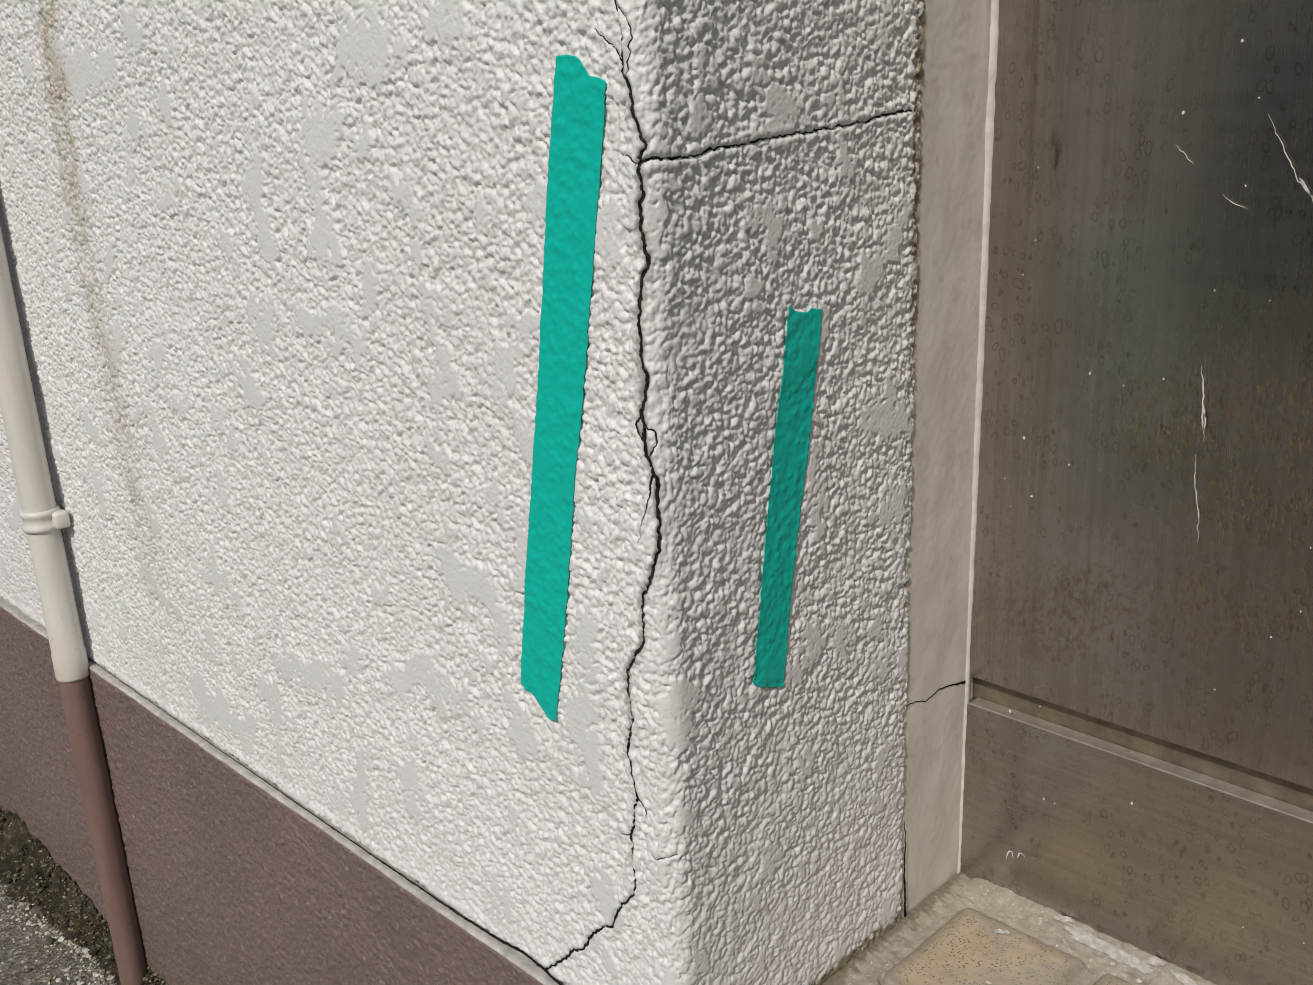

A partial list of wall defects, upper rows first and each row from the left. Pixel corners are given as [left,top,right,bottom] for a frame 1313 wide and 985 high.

crack [89,0,912,985]
crack [906,681,966,707]